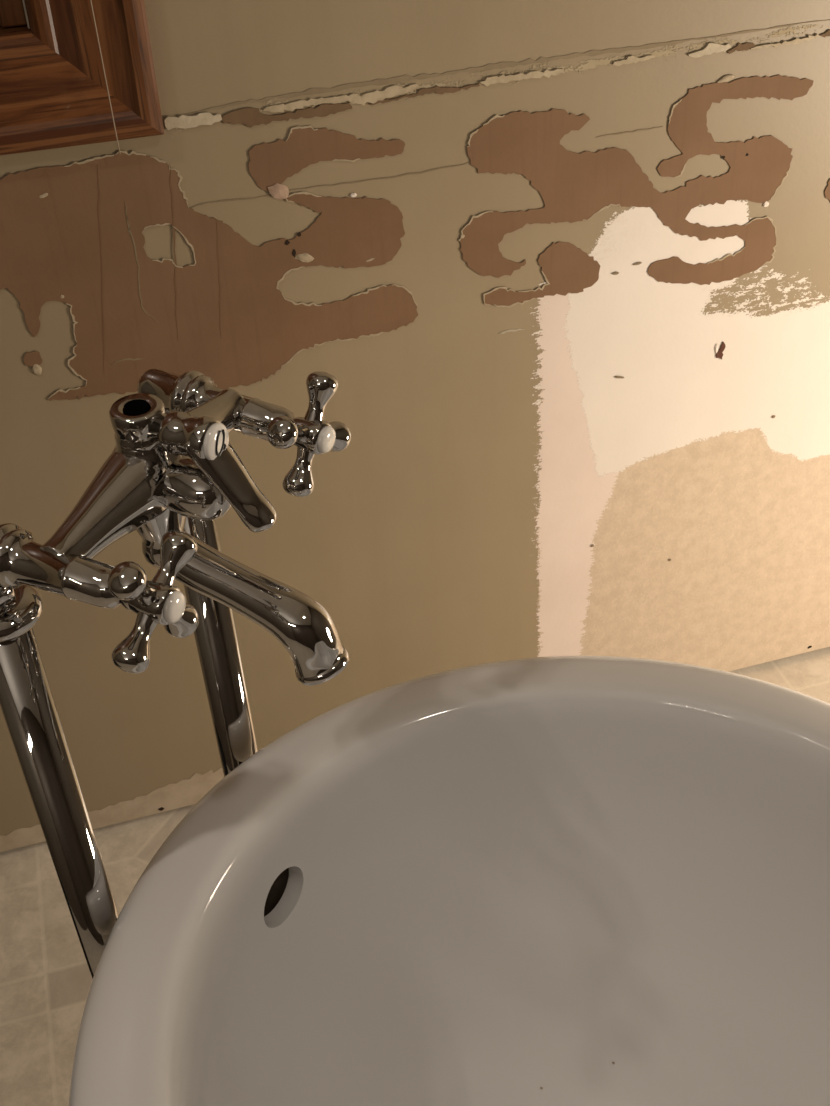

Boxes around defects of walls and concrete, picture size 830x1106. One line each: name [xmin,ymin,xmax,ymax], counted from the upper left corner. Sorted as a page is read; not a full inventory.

peeling [0,126,418,401]
peeling [458,75,814,308]
spalling [715,342,726,359]
peeling [580,428,830,671]